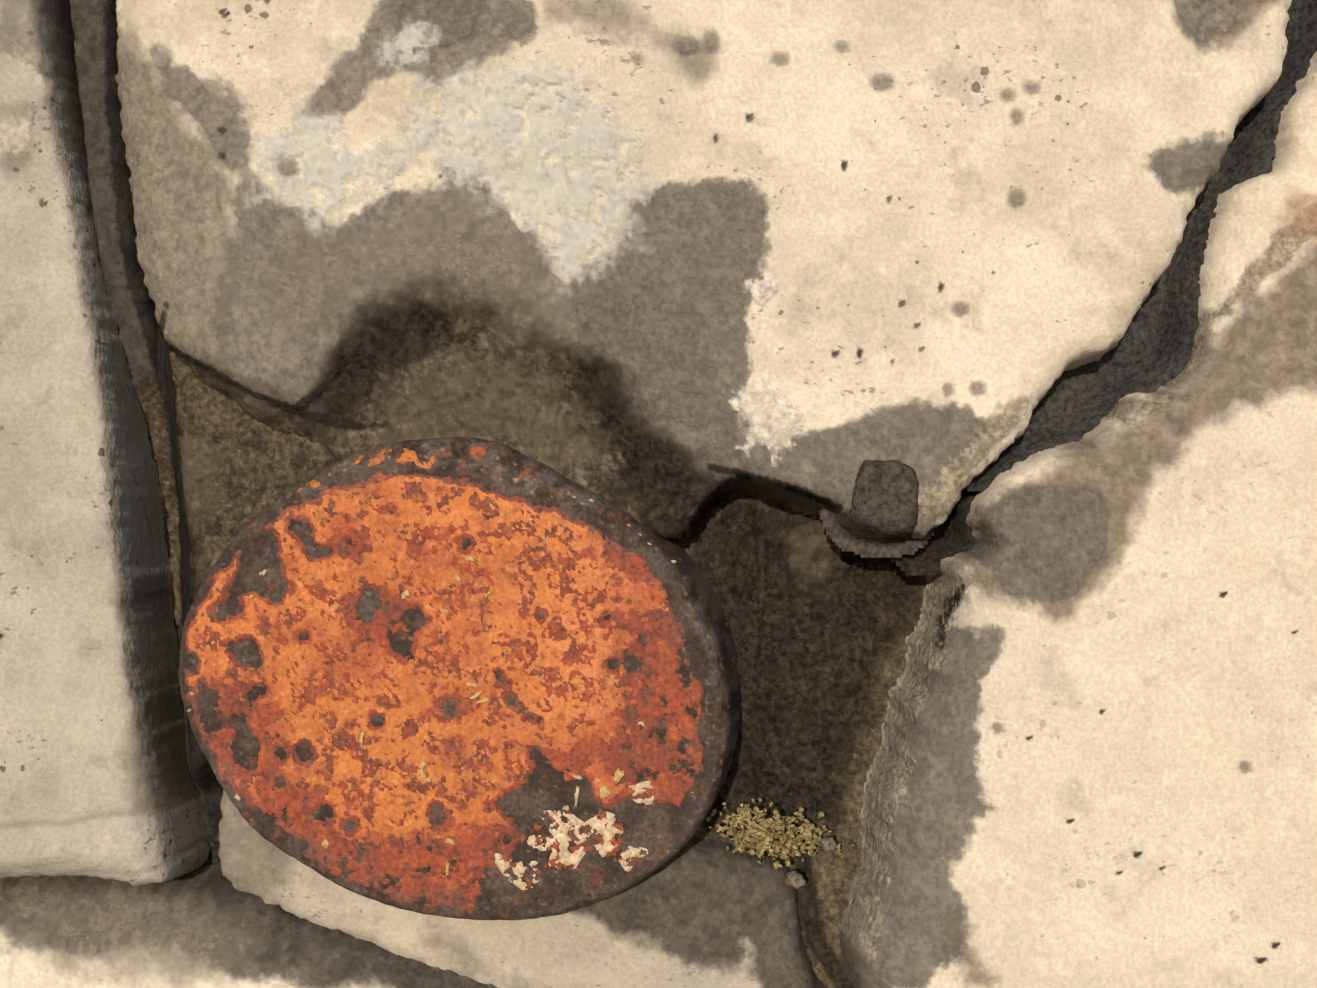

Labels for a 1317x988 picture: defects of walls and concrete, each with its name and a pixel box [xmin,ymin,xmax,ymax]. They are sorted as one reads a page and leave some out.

rust [470,446,487,457]
water stain [150,0,1004,988]
water stain [958,250,1317,620]
water stain [0,684,306,974]